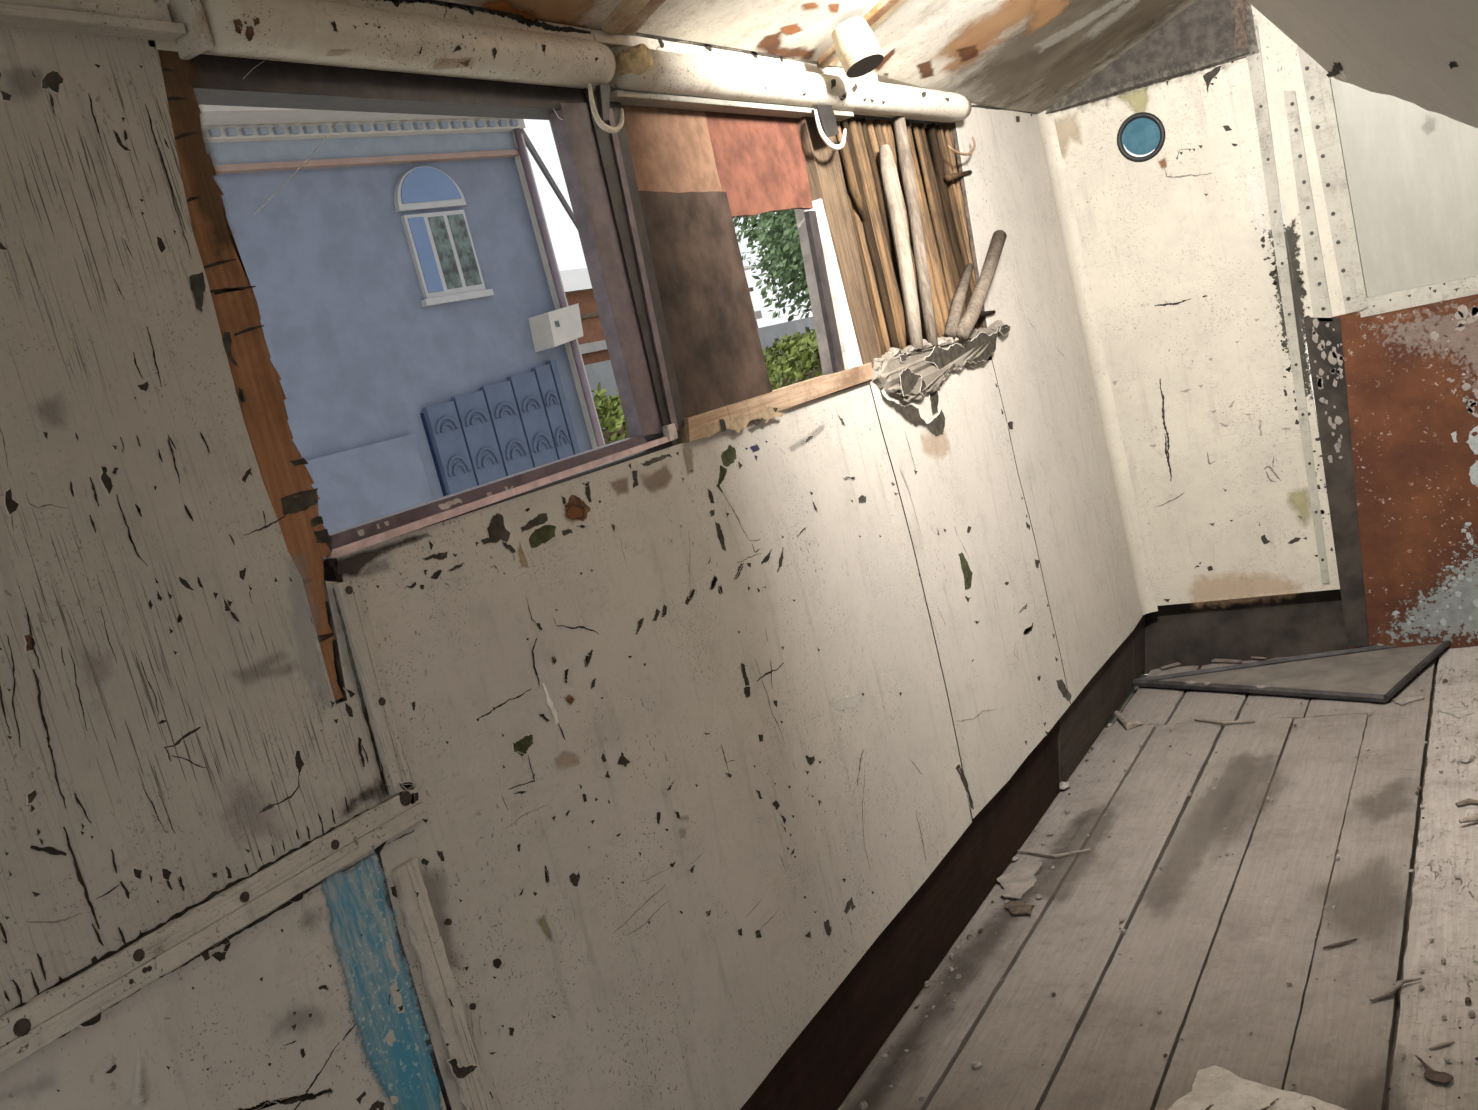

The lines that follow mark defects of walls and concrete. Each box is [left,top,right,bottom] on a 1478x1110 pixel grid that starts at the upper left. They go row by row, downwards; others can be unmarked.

peeling [830,79,886,105]
peeling [189,272,206,313]
peeling [879,324,1010,438]
peeling [1359,282,1478,487]
peeling [843,476,866,504]
peeling [476,481,601,568]
peeling [628,406,806,635]
peeling [149,575,240,633]
peeling [958,552,973,603]
peeling [502,649,603,768]
peeling [955,764,974,809]
peeling [231,1086,334,1110]